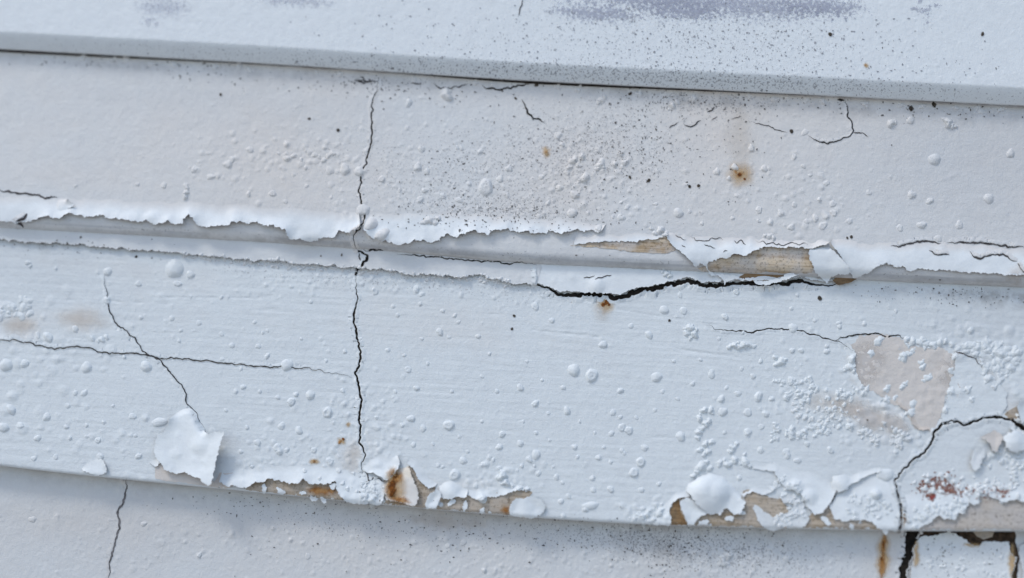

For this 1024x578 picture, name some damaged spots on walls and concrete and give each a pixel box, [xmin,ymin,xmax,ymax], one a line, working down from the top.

corrosion [734,169,747,181]
crack [0,77,868,482]
peeling [0,190,1024,285]
spalling [835,332,1024,471]
peeling [82,458,107,477]
crack [105,479,128,578]
peeling [150,408,545,519]
corrosion [388,470,407,503]
peeling [653,462,1024,578]
corrosion [878,536,888,576]
crack [888,410,1024,530]